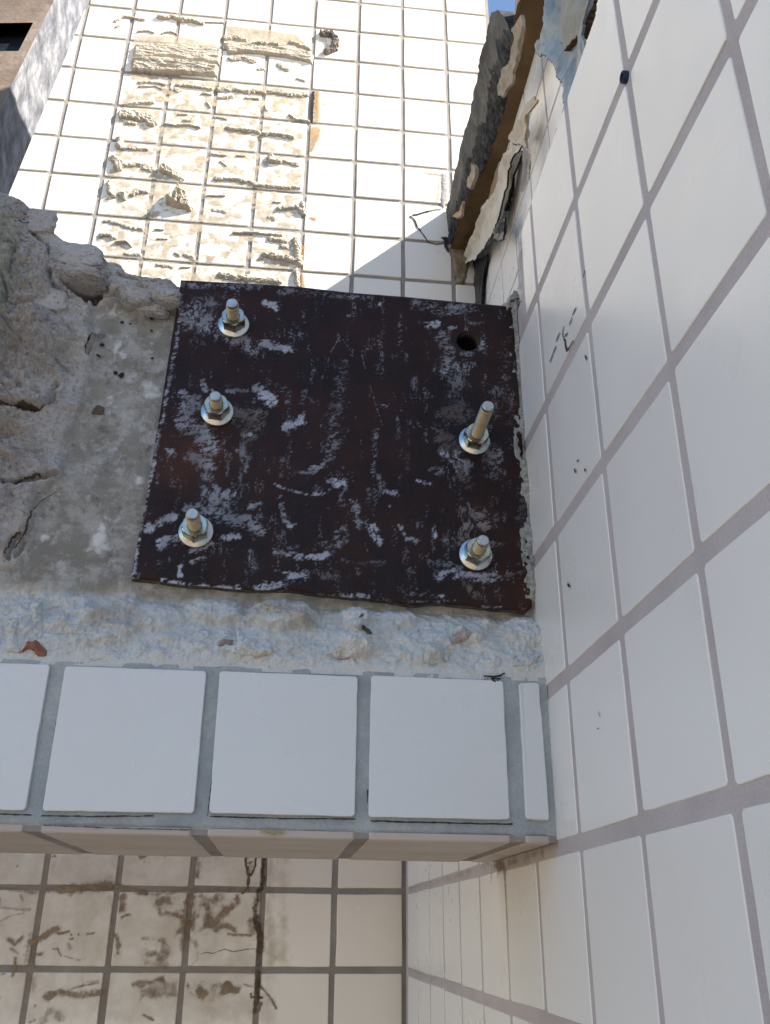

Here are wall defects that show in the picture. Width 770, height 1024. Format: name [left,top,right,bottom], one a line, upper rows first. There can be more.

peeling [227,54,306,83]
peeling [497,15,526,98]
spalling [423,163,479,219]
spalling [447,244,469,285]
crack [1,473,55,554]
damp [10,858,265,957]
damp [54,983,103,998]
damp [132,977,175,997]
damp [250,971,277,1013]